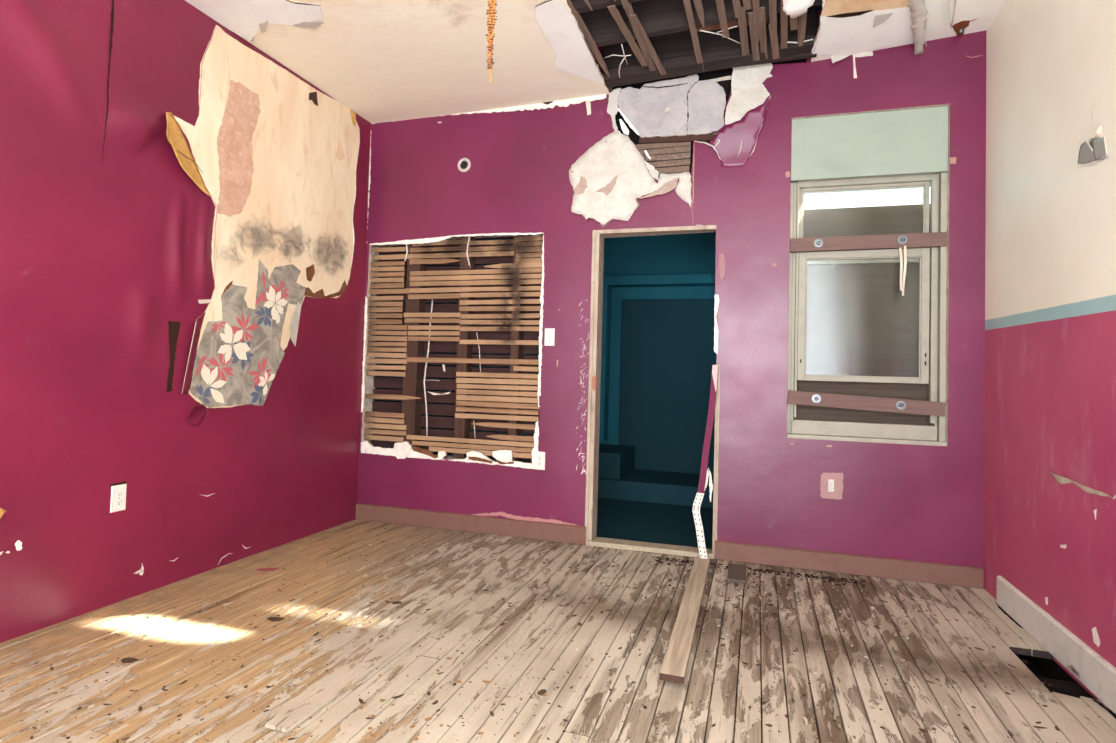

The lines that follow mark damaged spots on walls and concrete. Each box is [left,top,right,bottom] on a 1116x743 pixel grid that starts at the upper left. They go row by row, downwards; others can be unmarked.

peeling [813,0,928,63]
peeling [434,0,773,182]
hole [1078,105,1109,165]
flaking render [166,0,408,351]
flaking render [361,233,544,469]
peeling [1042,468,1116,499]
peeling [1092,627,1100,647]